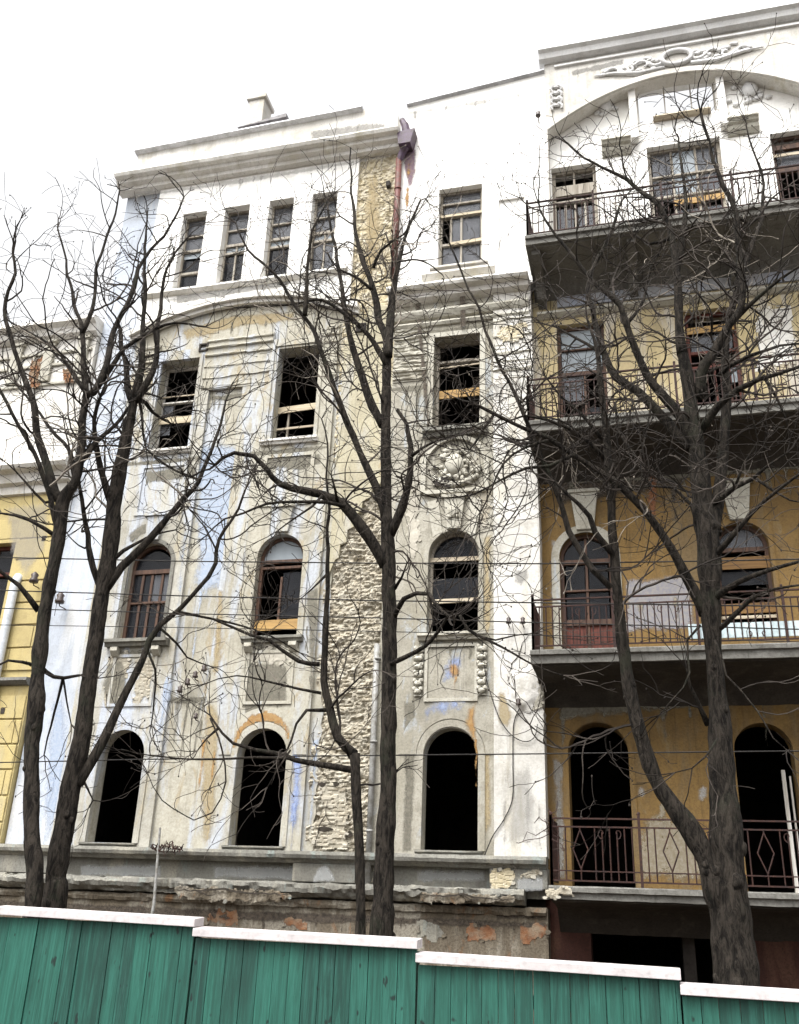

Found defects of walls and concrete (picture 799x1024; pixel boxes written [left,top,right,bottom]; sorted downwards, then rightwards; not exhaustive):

rust [404,147,415,208]
leakage [127,393,326,611]
peeling [626,577,692,632]
spalling [311,779,353,850]
spalling [174,885,292,926]
peeling [281,917,307,930]
peeling [415,920,446,942]
spalling [416,867,542,905]
peeling [465,923,496,942]
peeling [520,922,551,944]
spalling [543,886,574,900]